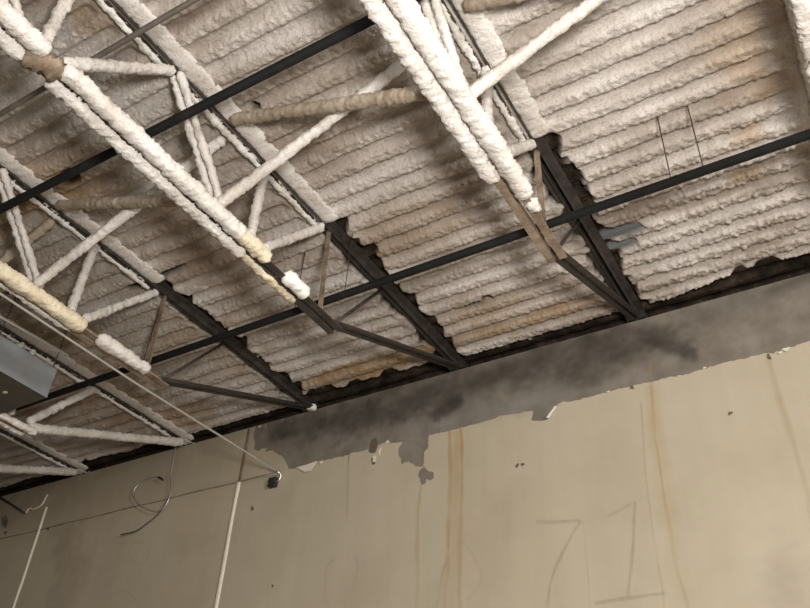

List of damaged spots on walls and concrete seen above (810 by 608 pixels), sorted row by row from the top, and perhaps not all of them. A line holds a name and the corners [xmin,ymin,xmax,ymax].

peeling [254,273,810,485]